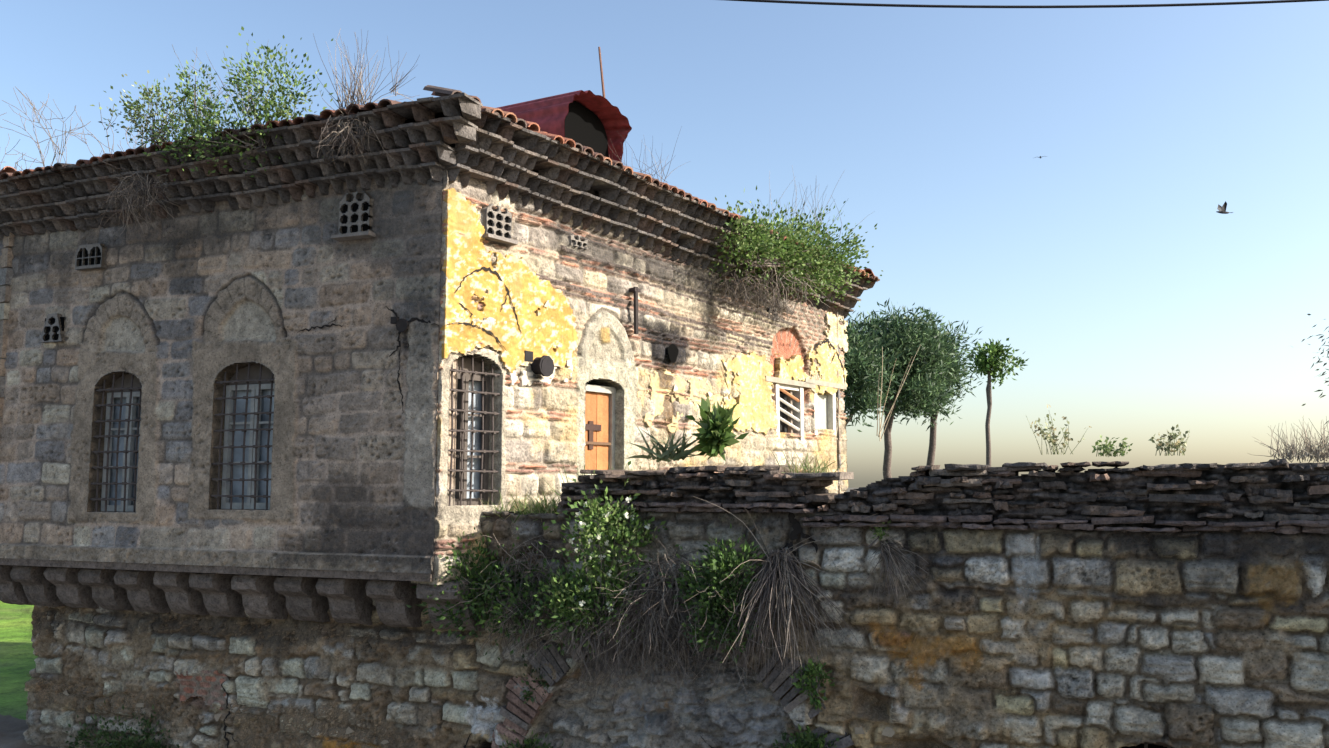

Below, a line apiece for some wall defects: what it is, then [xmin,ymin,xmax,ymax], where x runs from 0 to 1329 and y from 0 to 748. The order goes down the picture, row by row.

crack [386,267,521,411]
flaking render [440,188,578,394]
flaking render [637,312,848,435]